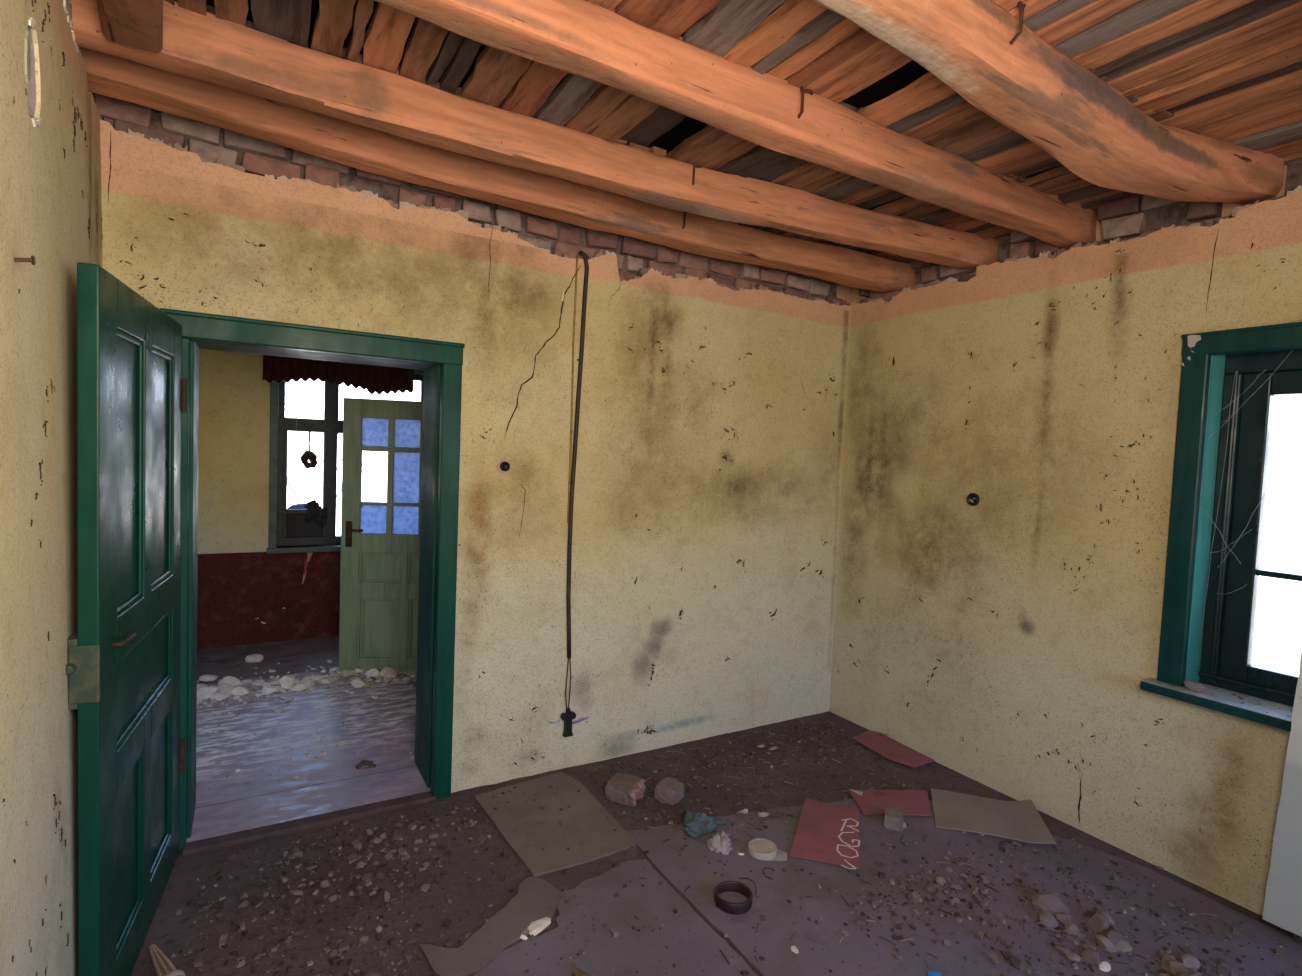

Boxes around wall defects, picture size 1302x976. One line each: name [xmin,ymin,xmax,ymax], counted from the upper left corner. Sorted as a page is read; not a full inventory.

flaking render [13,0,79,127]
peeling [58,91,87,159]
flaking render [94,93,977,306]
flaking render [997,160,1302,309]
crack [1206,229,1219,312]
crack [505,266,581,435]
peeling [1173,332,1201,366]